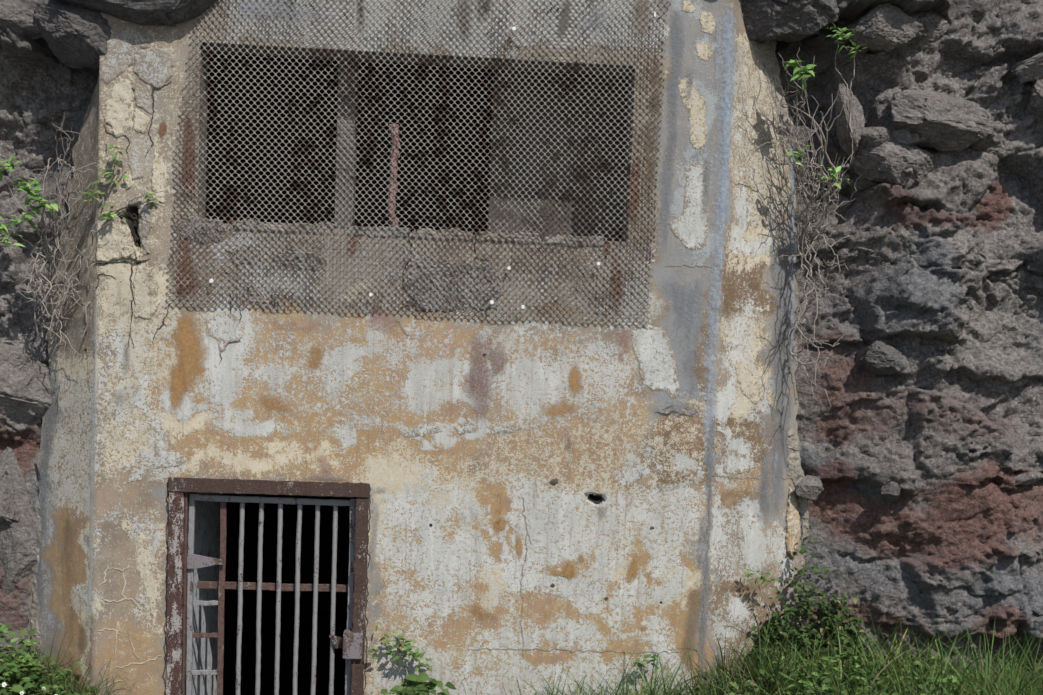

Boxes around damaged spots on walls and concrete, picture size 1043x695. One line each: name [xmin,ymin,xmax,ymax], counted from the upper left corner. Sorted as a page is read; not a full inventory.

peeling [682,0,716,61]
peeling [95,29,176,319]
crack [105,82,170,181]
peeling [669,162,710,251]
peeling [677,78,708,150]
damp [703,24,734,335]
spalling [752,40,791,165]
crack [93,259,171,361]
peeling [631,325,680,400]
peeling [127,430,188,483]
peeling [723,448,756,477]
peeling [120,517,158,632]